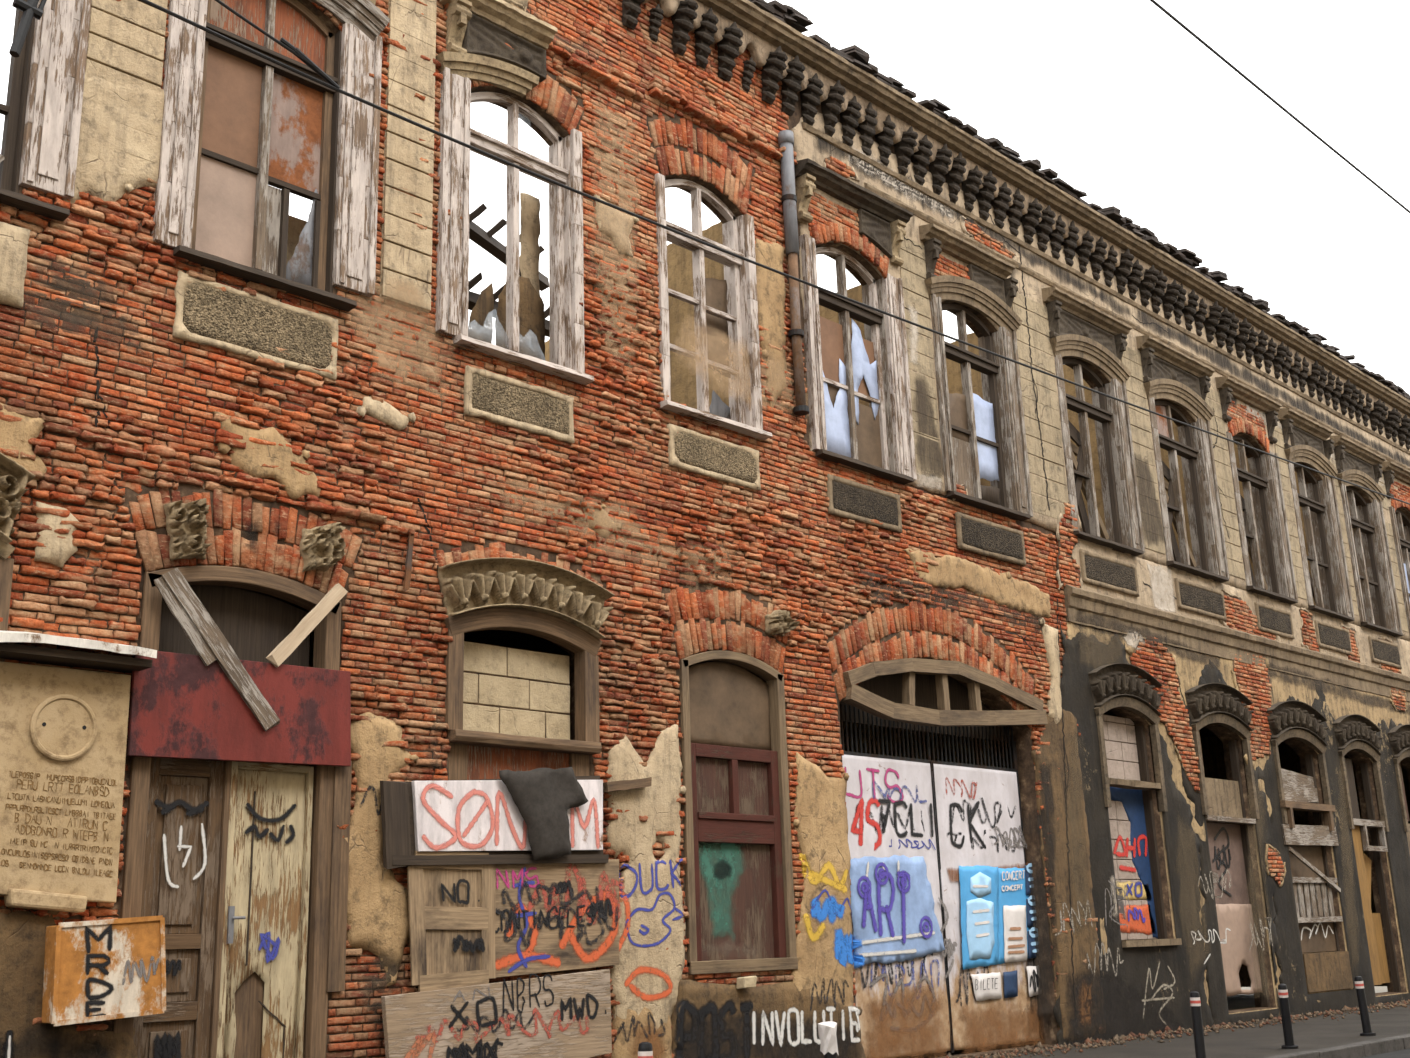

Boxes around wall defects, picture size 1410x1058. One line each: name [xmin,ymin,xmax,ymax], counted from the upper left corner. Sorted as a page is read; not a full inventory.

flaking render [0,403,47,481]
flaking render [212,412,321,500]
flaking render [356,396,416,431]
crack [969,212,1050,511]
flaking render [1390,481,1410,506]
flaking render [345,712,419,987]
flaking render [605,724,866,1058]
leakage [1027,739,1184,1045]
flaking render [905,502,1410,1045]